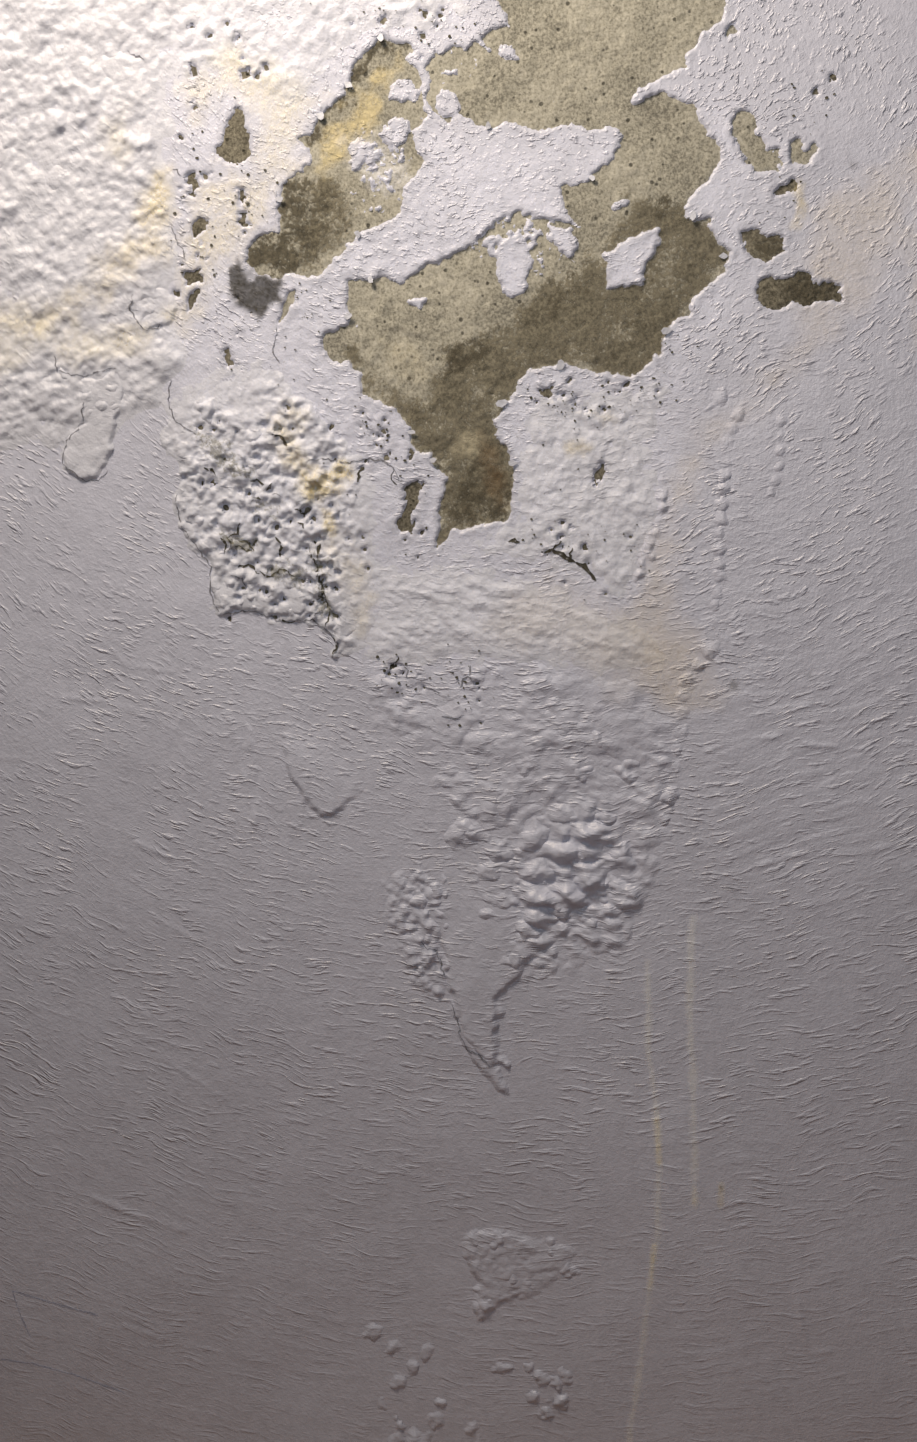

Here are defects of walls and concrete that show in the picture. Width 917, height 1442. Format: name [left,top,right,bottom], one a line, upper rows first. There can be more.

damp [308,468,342,498]
peeling [160,0,842,727]